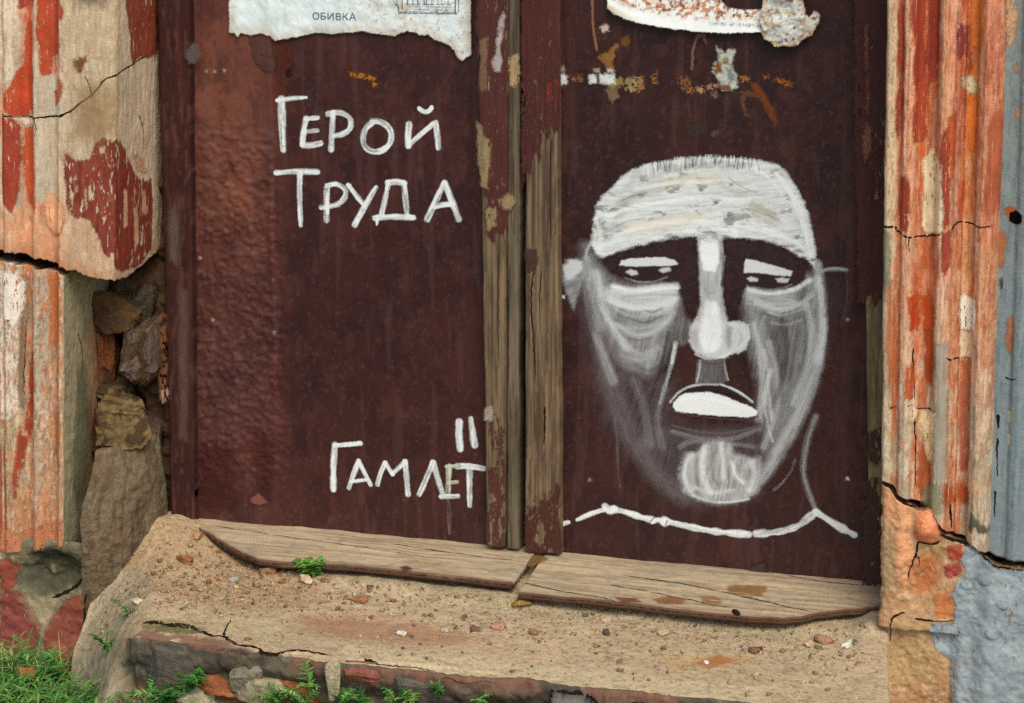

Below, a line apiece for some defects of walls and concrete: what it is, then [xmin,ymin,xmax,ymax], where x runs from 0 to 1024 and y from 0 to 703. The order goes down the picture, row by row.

peeling [2,0,153,272]
crack [2,50,154,132]
peeling [126,0,159,64]
peeling [852,0,1003,307]
crack [884,221,991,252]
peeling [17,274,29,407]
flaking render [958,294,977,358]
crack [884,348,1023,580]
flaking render [0,519,84,674]
crack [143,620,329,656]
crack [889,612,955,642]
peeling [916,510,1024,703]